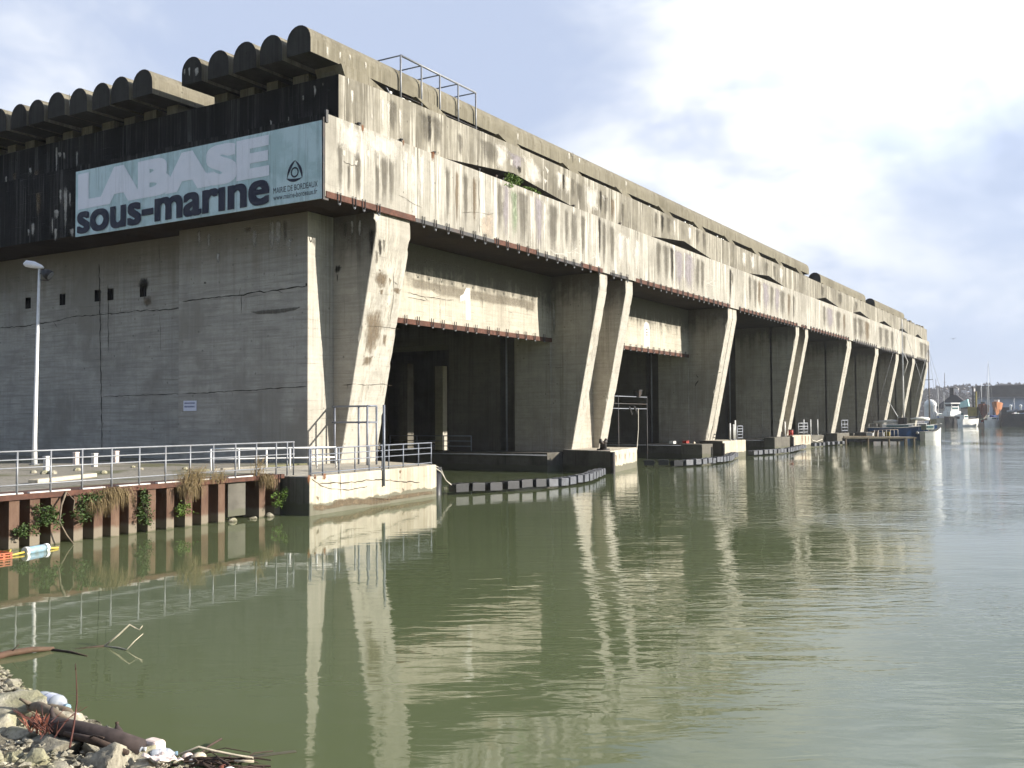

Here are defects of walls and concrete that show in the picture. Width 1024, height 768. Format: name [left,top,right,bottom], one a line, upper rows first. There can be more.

water stain [338,146,360,188]
water stain [376,153,476,219]
water stain [421,115,440,140]
water stain [482,141,494,159]
water stain [558,172,581,198]
water stain [344,220,385,261]
water stain [498,185,585,248]
water stain [598,191,639,263]
water stain [657,244,704,286]
water stain [743,252,794,317]
water stain [823,294,905,350]
crack [1,267,306,448]